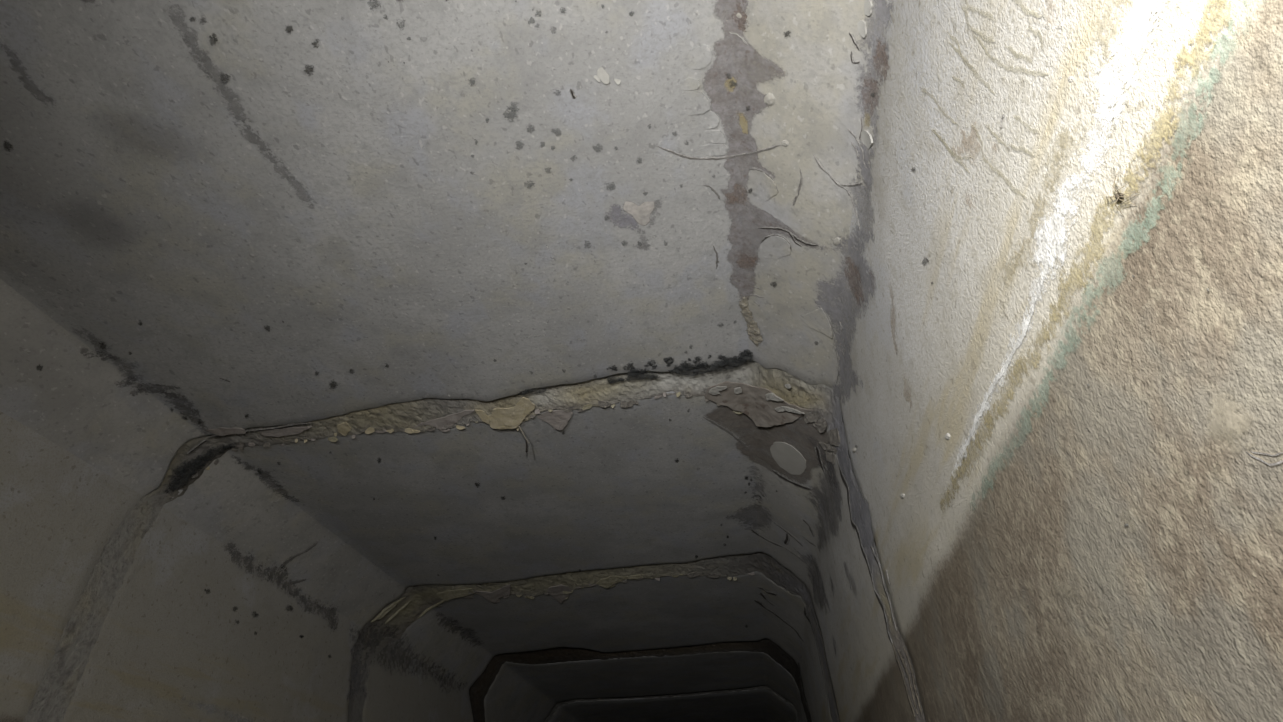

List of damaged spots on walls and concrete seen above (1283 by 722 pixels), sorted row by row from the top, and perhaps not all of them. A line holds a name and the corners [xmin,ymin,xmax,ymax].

leakage [189,17,218,62]
leakage [858,0,892,106]
leakage [594,0,822,384]
leakage [857,145,872,197]
leakage [951,0,1164,478]
leakage [815,227,874,402]
peeling [237,422,420,448]
peeling [456,397,586,431]
spalling [704,381,814,475]
leakage [706,406,841,607]